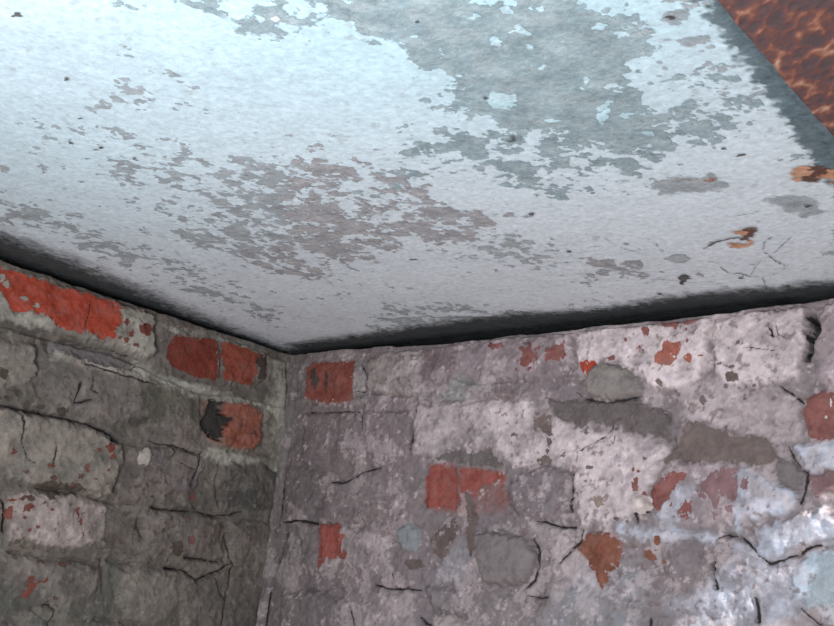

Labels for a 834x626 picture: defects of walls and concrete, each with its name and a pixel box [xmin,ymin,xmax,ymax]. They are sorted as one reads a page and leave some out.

peeling [0,0,767,332]
rust [790,166,834,184]
rust [727,227,757,249]
peeling [0,266,153,371]
spalling [166,334,266,386]
peeling [654,319,704,366]
crack [0,350,154,464]
crack [150,505,241,622]
crack [280,480,319,563]
crack [332,468,380,484]
peeling [424,449,504,558]
crack [719,534,823,565]